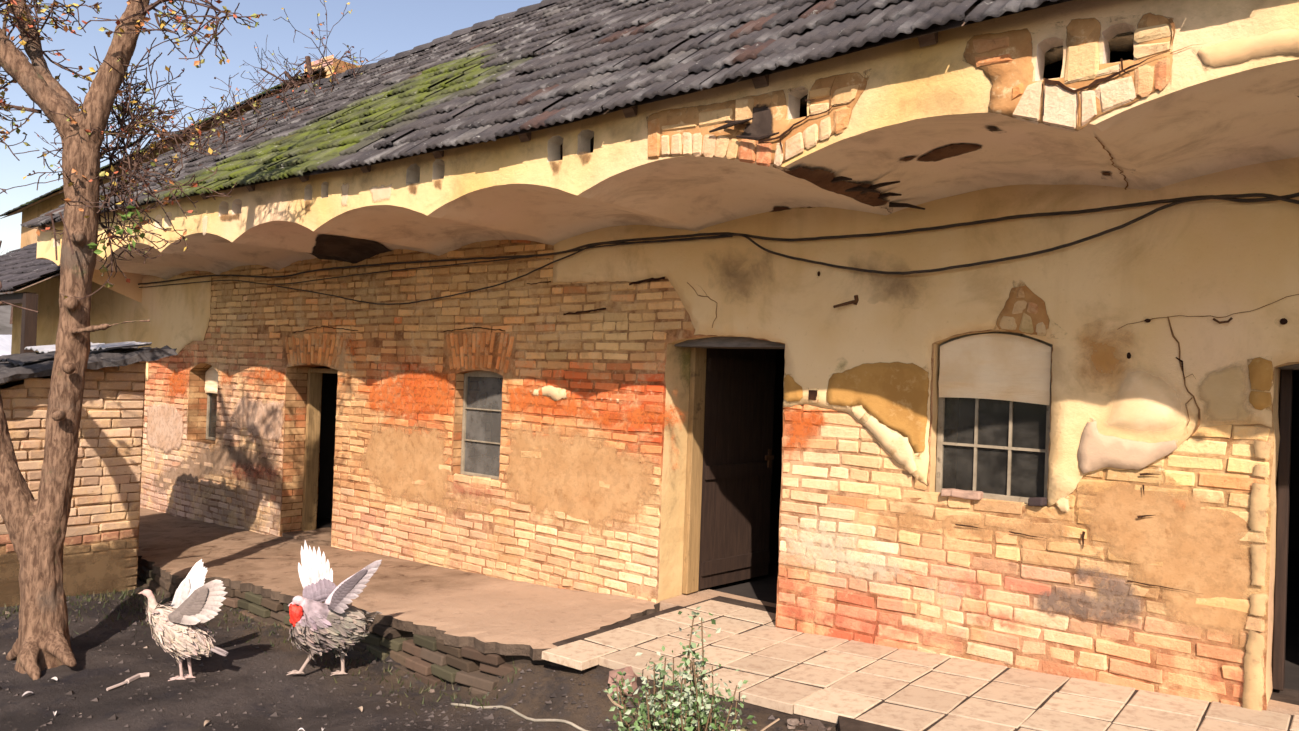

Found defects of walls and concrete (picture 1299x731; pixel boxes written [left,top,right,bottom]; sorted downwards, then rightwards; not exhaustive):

flaking render [646,70,925,210]
spalling [900,144,982,162]
flaking render [963,13,1174,132]
flaking render [140,235,694,603]
flaking render [996,285,1049,336]
crack [1117,294,1299,436]
flaking render [777,357,1273,707]
leakage [1038,568,1141,625]